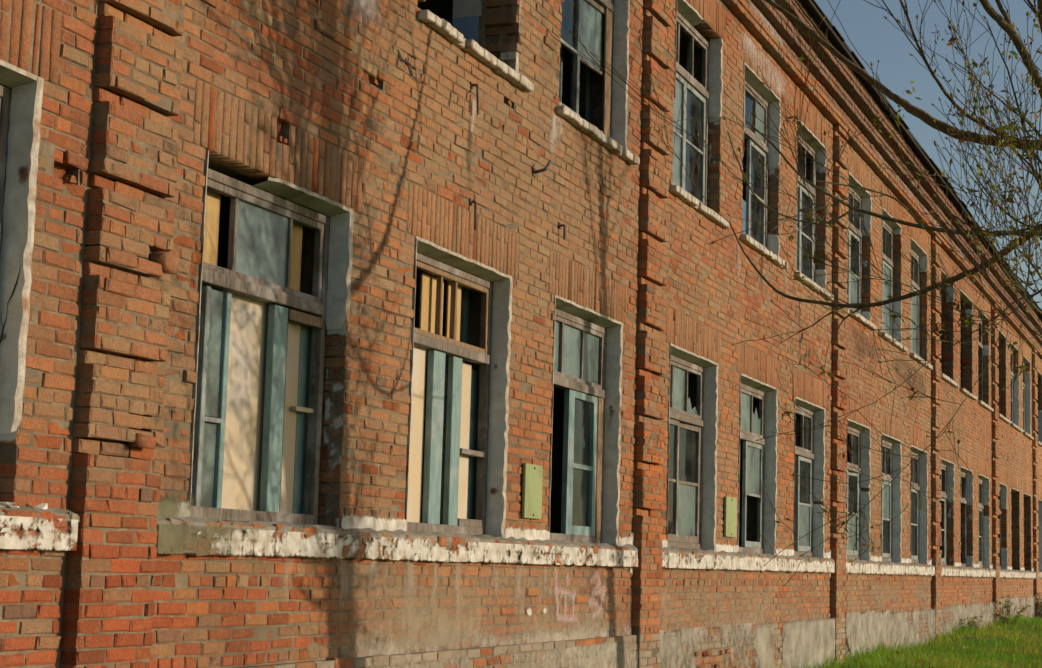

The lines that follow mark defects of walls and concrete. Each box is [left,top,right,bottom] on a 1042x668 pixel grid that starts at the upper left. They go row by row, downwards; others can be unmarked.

crack [0,265,21,343]
peeling [177,502,190,517]
peeling [0,515,78,551]
peeling [212,514,638,573]
peeling [661,540,1036,581]